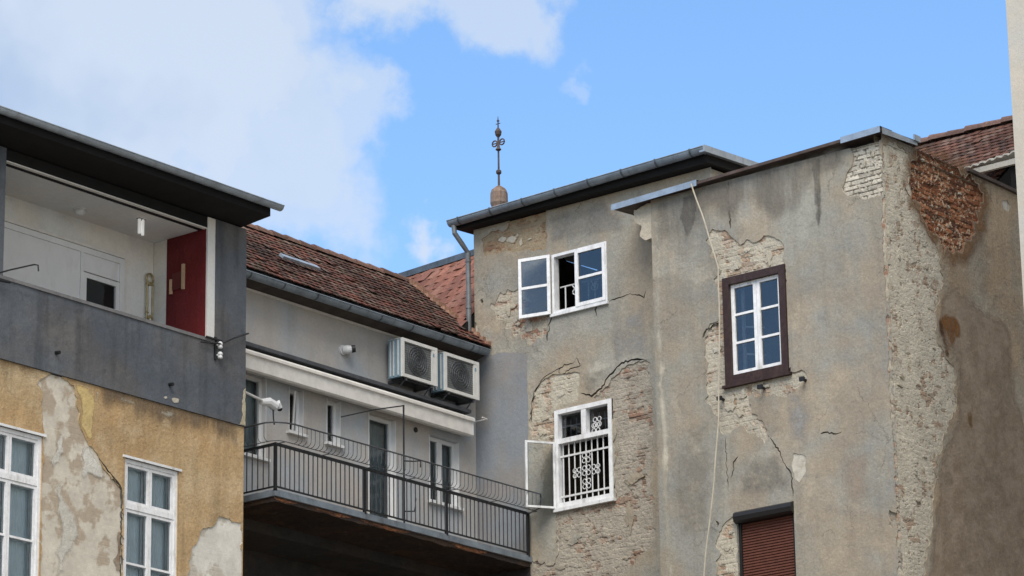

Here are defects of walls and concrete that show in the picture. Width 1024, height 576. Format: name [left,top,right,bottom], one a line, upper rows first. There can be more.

damp [681,185,739,226]
damp [757,150,838,213]
spalling [480,289,550,346]
crack [531,357,580,421]
crack [581,358,644,397]
spalling [704,229,808,443]
spalling [842,141,983,576]
damp [930,289,1024,576]
spalling [529,360,656,576]
crack [770,438,793,492]
crack [99,459,123,576]
peeling [188,516,243,576]